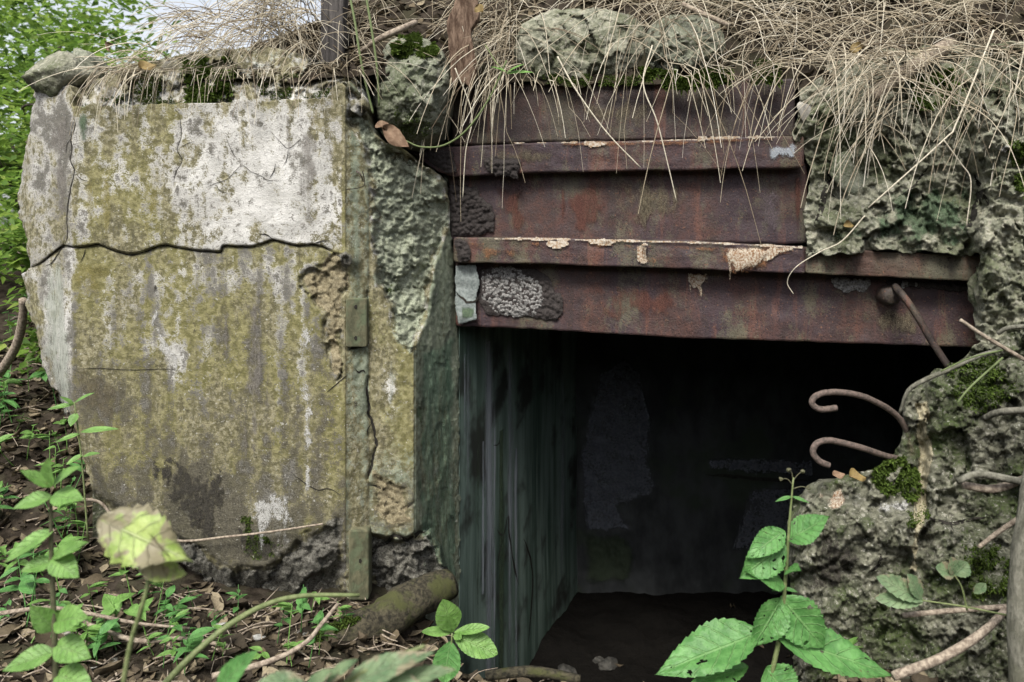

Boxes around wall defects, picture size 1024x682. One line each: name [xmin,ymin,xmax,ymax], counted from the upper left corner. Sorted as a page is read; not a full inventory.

crack [33,116,340,267]
spalling [304,255,349,375]
spalling [351,113,450,353]
rust [425,149,803,271]
rust [561,135,773,148]
rust [875,277,968,292]
water stain [300,384,313,447]
crack [325,340,411,509]
water stain [153,457,226,539]
spalling [175,514,346,594]
water stain [236,495,291,560]
peeling [709,437,898,549]